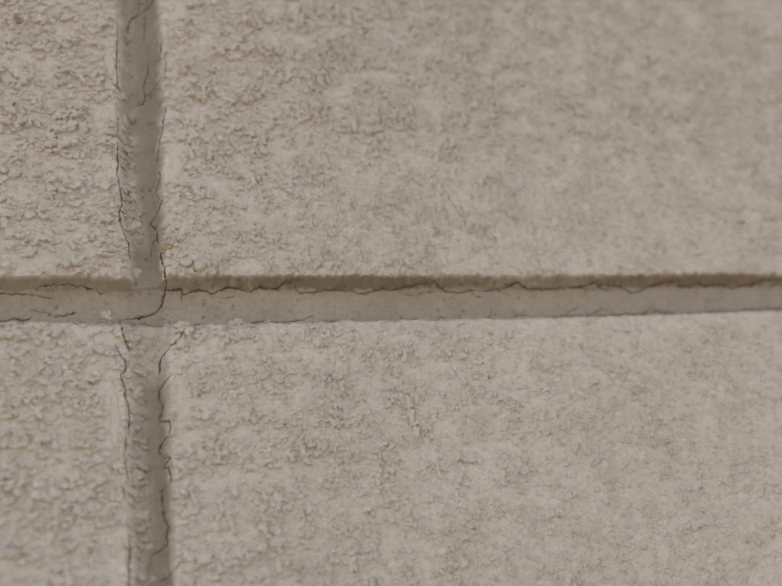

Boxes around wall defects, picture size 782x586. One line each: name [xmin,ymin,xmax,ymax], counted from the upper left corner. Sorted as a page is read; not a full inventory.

crack [115,0,166,106]
crack [106,119,131,262]
crack [0,282,106,322]
crack [116,108,782,586]